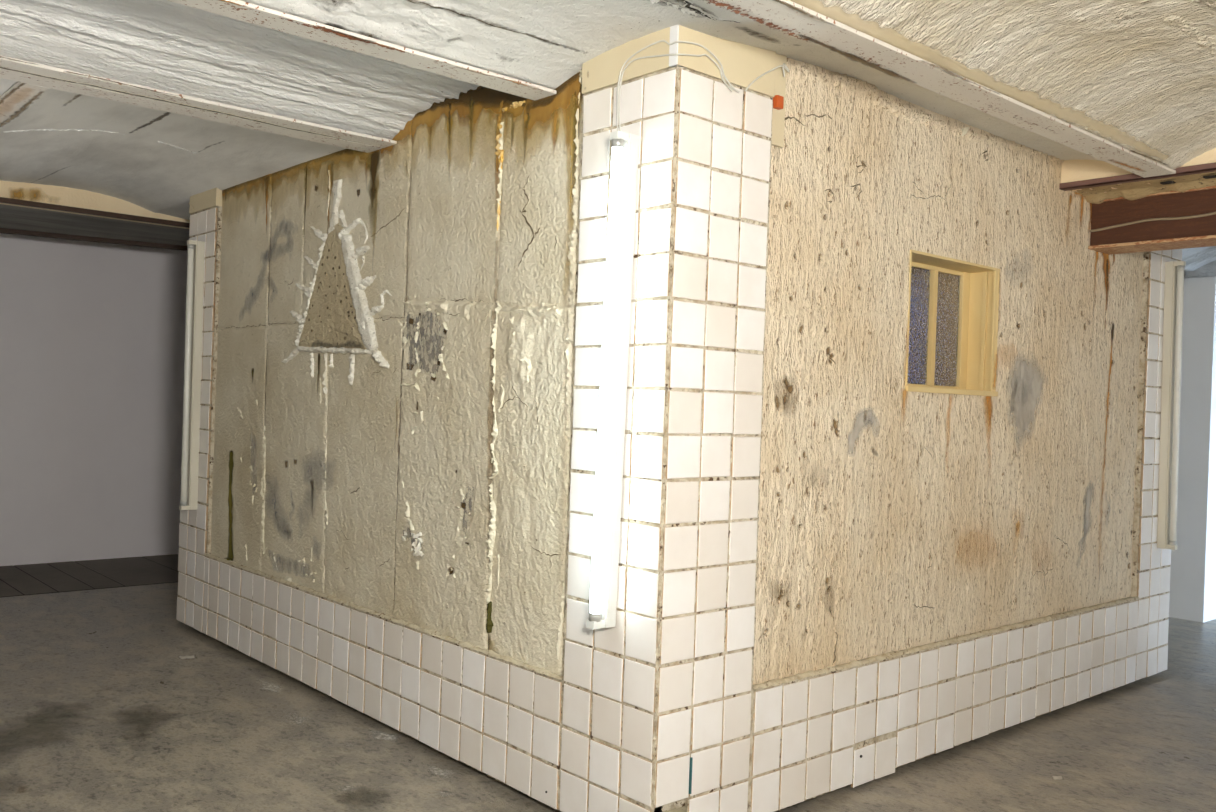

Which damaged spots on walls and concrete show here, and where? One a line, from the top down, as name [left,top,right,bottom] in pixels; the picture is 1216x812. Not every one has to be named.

crack [681,0,742,23]
corrosion [706,0,915,83]
damp [495,100,525,231]
crack [517,175,558,268]
spalling [401,302,450,434]
spalling [401,482,424,570]